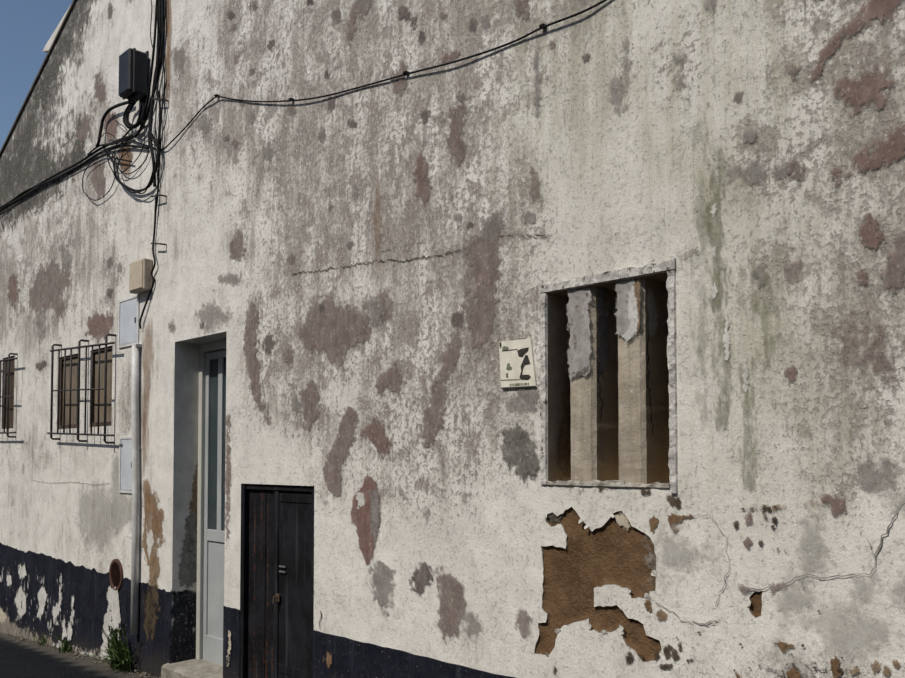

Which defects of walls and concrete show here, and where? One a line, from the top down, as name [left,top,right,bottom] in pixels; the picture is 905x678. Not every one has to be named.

damp [0,0,96,232]
peeling [597,286,610,374]
peeling [621,281,658,342]
damp [496,422,540,487]
peeling [0,563,100,657]
peeling [141,480,164,589]
spalling [515,495,695,662]
crack [659,501,904,627]
spalling [786,668,801,678]
spalling [830,656,860,678]
spalling [871,660,901,676]